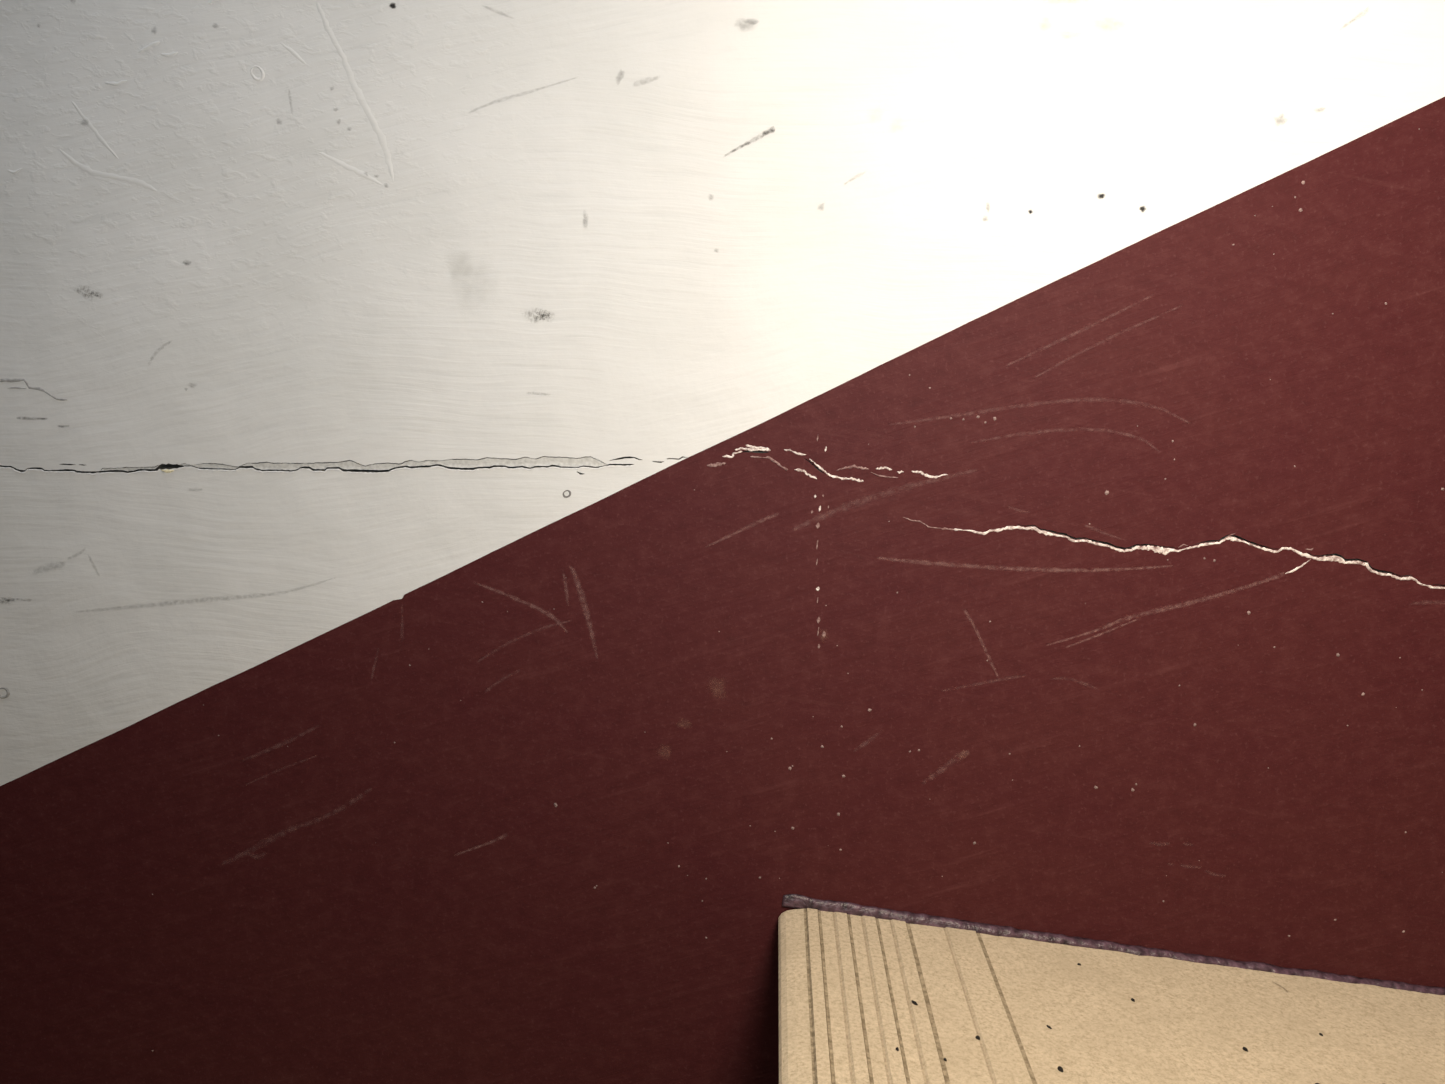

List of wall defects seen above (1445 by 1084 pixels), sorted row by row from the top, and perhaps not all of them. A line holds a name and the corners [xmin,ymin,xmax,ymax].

crack [0,436,948,648]
crack [904,517,1445,589]